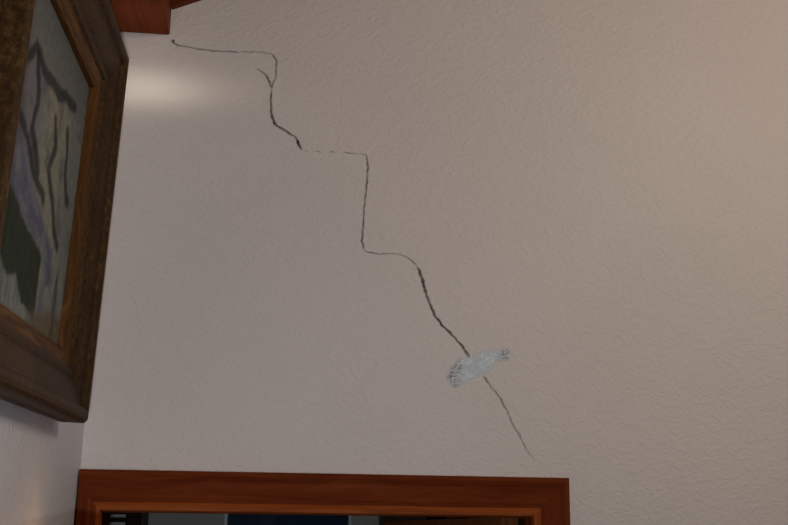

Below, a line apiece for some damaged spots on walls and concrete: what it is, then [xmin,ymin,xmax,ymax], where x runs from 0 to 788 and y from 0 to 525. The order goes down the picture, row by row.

crack [260,55,347,153]
crack [407,257,469,357]